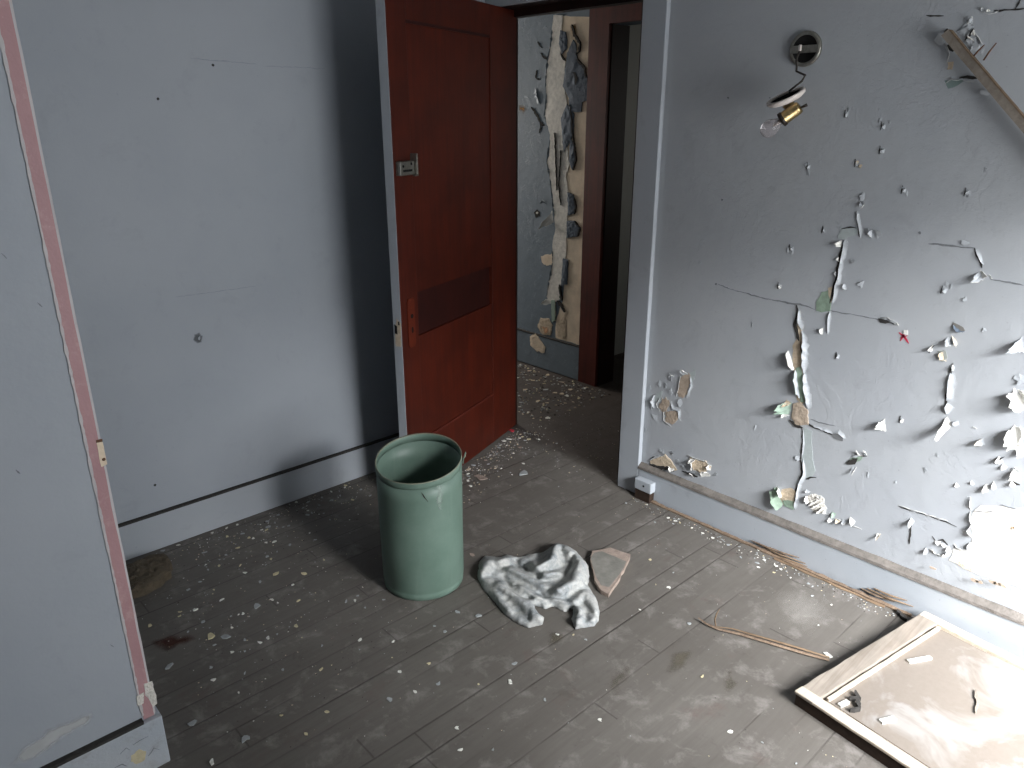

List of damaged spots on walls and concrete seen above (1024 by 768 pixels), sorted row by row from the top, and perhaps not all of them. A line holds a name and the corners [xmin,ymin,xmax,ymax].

peeling [530,15,589,353]
crack [930,240,1024,286]
crack [721,285,878,320]
peeling [774,192,882,428]
peeling [1005,336,1024,354]
peeling [644,368,696,432]
peeling [648,448,718,478]
peeling [846,450,867,475]
peeling [928,322,965,441]
peeling [995,374,1024,487]
peeling [769,486,862,530]
spalling [923,481,1024,589]